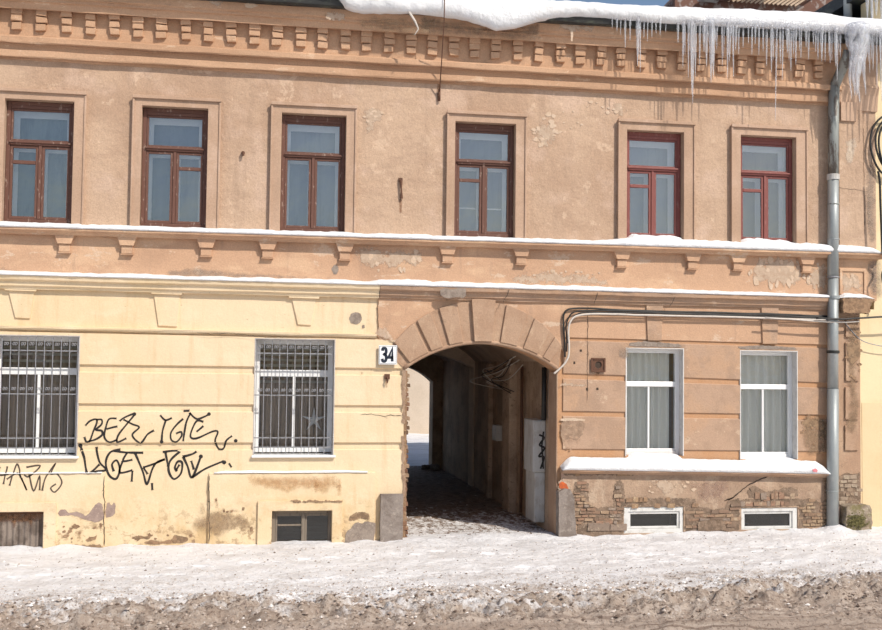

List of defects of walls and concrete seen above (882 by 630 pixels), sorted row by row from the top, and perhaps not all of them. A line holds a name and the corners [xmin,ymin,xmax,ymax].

flaking render [355,246,423,273]
flaking render [748,256,826,292]
flaking render [58,503,116,548]
damp [198,513,244,531]
flaking render [558,473,827,537]
crack [725,477,767,501]